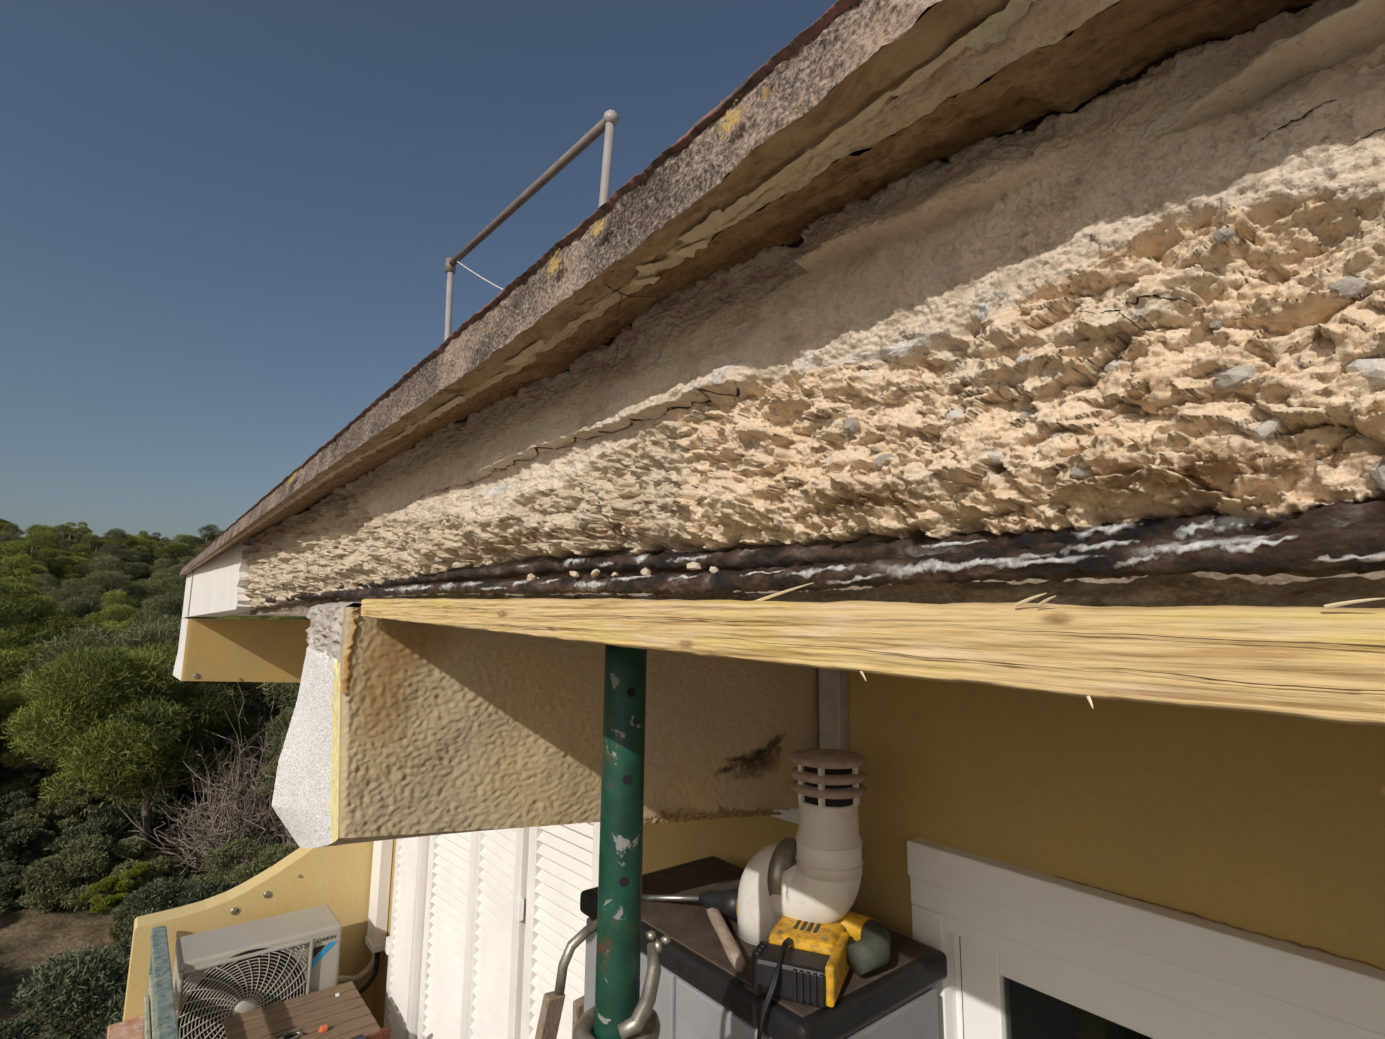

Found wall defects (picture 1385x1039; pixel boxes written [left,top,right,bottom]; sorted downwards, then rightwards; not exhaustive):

crack [996,3,1313,137]
peeling [633,0,1036,286]
crack [752,237,804,258]
crack [401,382,740,510]
crack [258,469,375,533]
damp [386,565,528,594]
damp [575,555,649,589]
efflorescence [747,515,1292,584]
efflorescence [1319,553,1385,562]